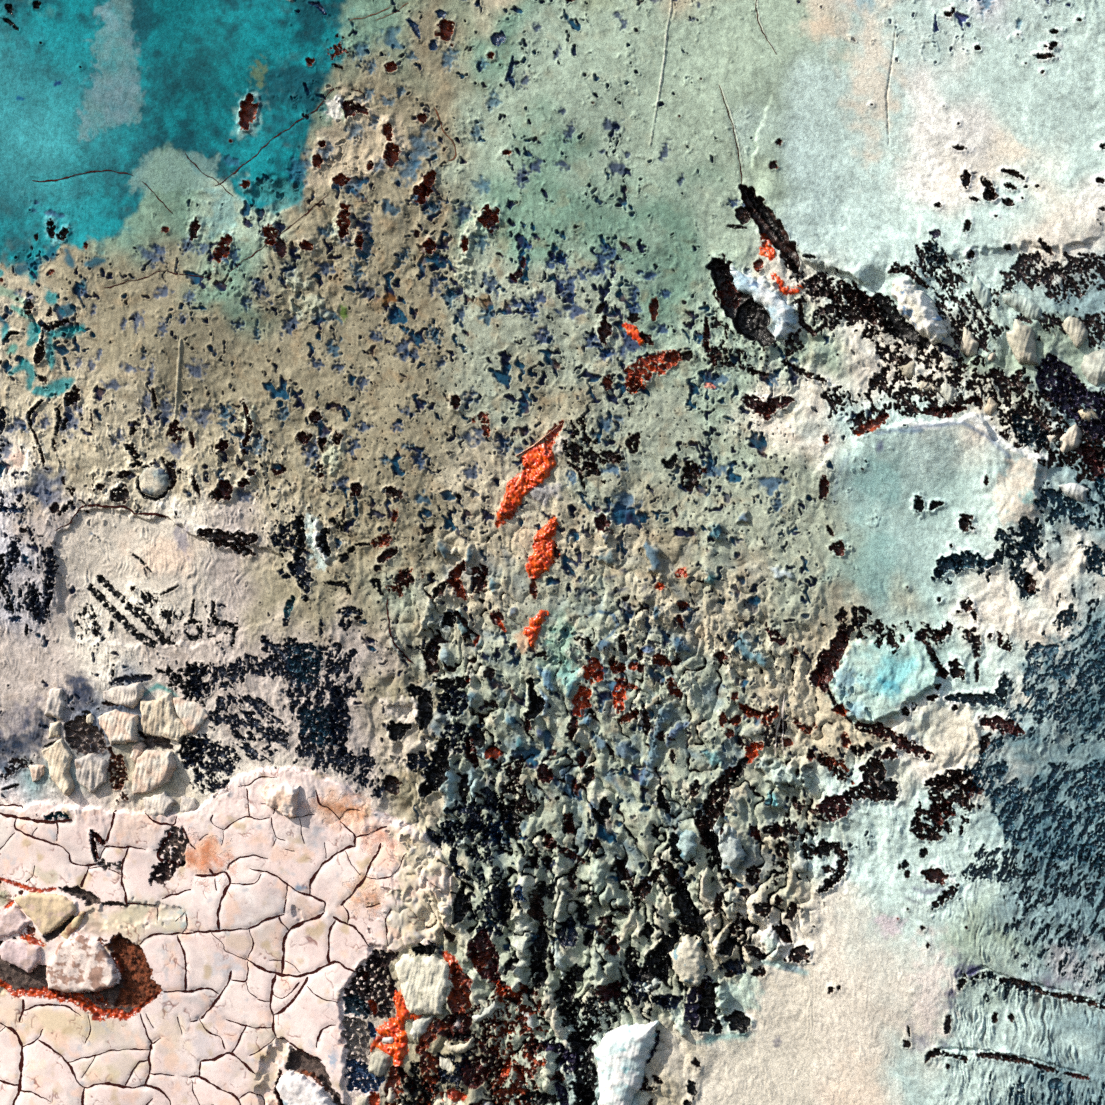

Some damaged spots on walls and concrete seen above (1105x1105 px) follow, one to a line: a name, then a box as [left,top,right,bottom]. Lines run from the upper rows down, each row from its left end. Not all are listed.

spalling [596,303,612,344]
rust [622,323,682,393]
spalling [681,185,1105,599]
rust [495,420,564,528]
peeling [563,417,640,489]
peeling [433,560,488,600]
rust [523,611,548,647]
rust [526,518,560,598]
peeling [427,585,1105,1105]
crack [0,776,406,1105]
peeling [274,953,505,1105]
rust [369,951,549,1105]